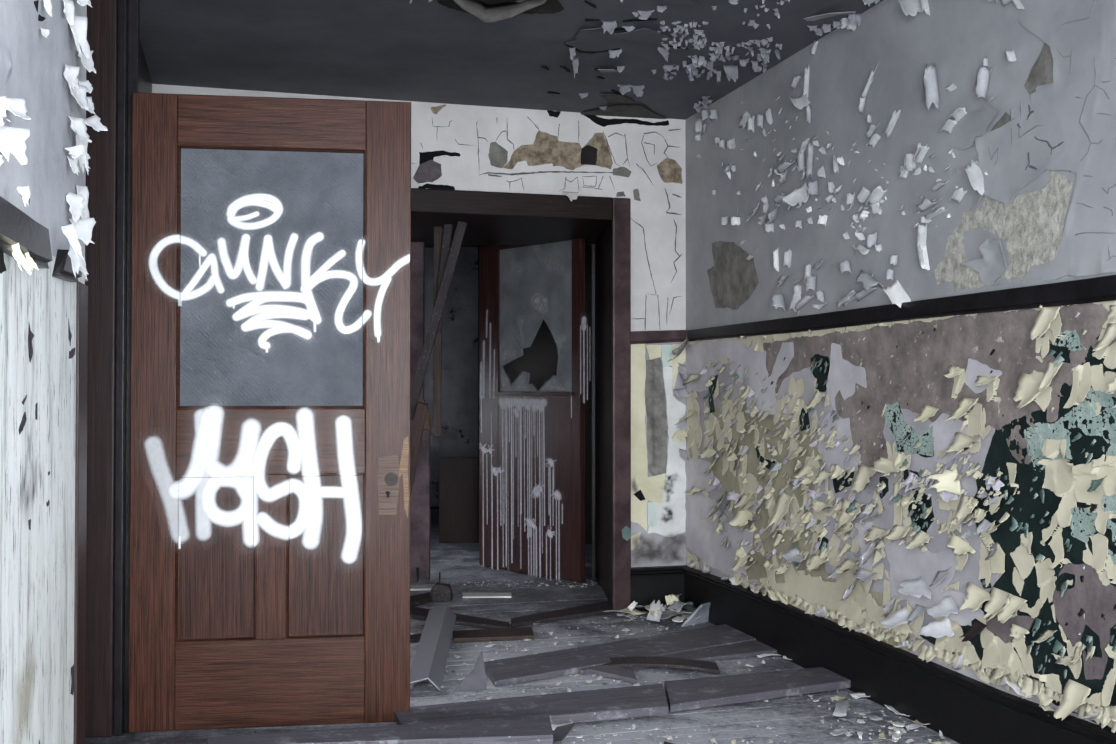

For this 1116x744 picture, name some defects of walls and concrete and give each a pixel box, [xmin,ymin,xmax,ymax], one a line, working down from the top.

spalling [429,0,564,23]
crack [541,0,688,96]
peeling [565,0,790,97]
peeling [0,96,32,167]
peeling [16,186,31,207]
peeling [61,0,108,281]
spalling [413,150,460,190]
crack [411,117,682,330]
flaking render [488,131,641,201]
crack [988,0,1116,261]
flaking render [622,0,1116,733]